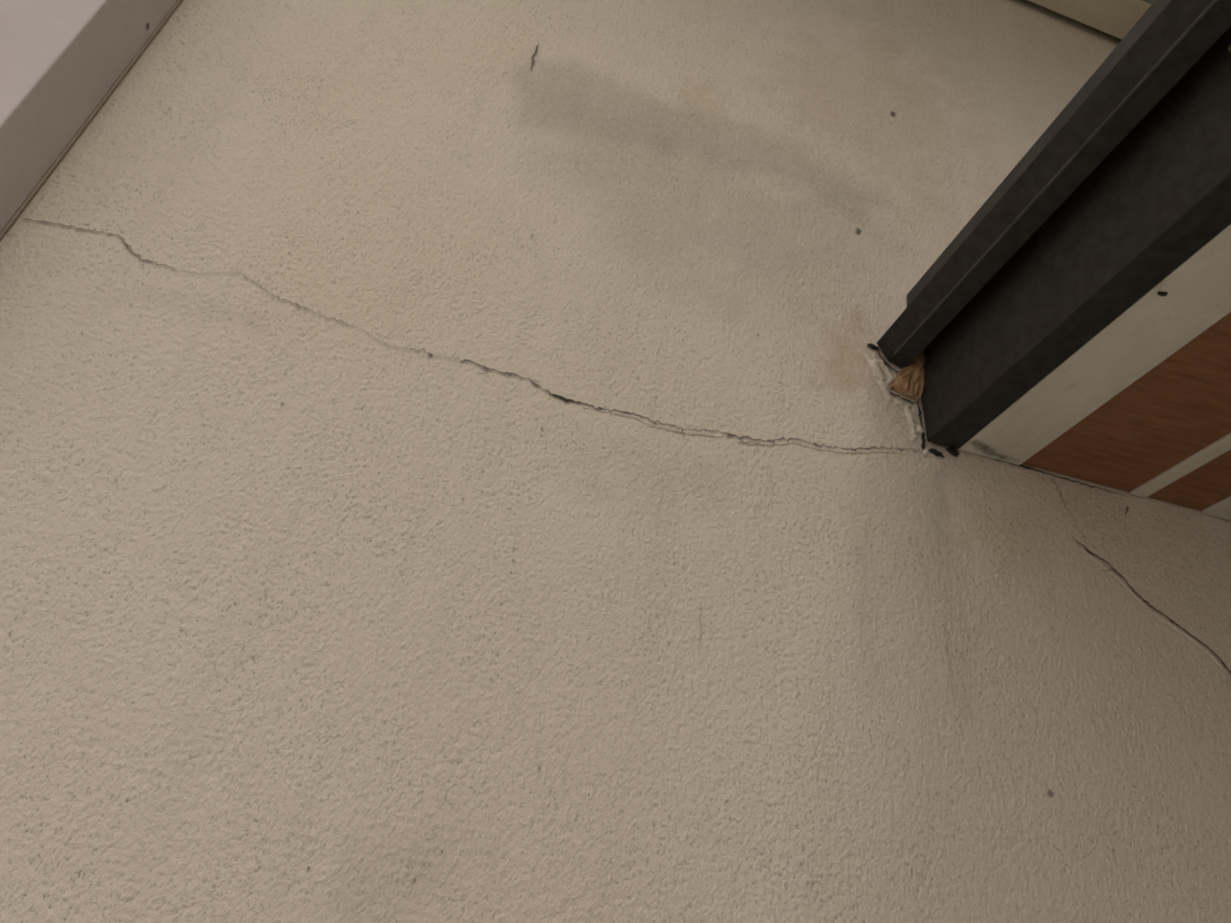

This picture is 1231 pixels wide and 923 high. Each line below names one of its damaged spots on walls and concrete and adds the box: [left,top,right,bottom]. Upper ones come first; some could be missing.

crack [23,218,922,456]
flaking render [861,349,929,456]
crack [996,459,1231,673]